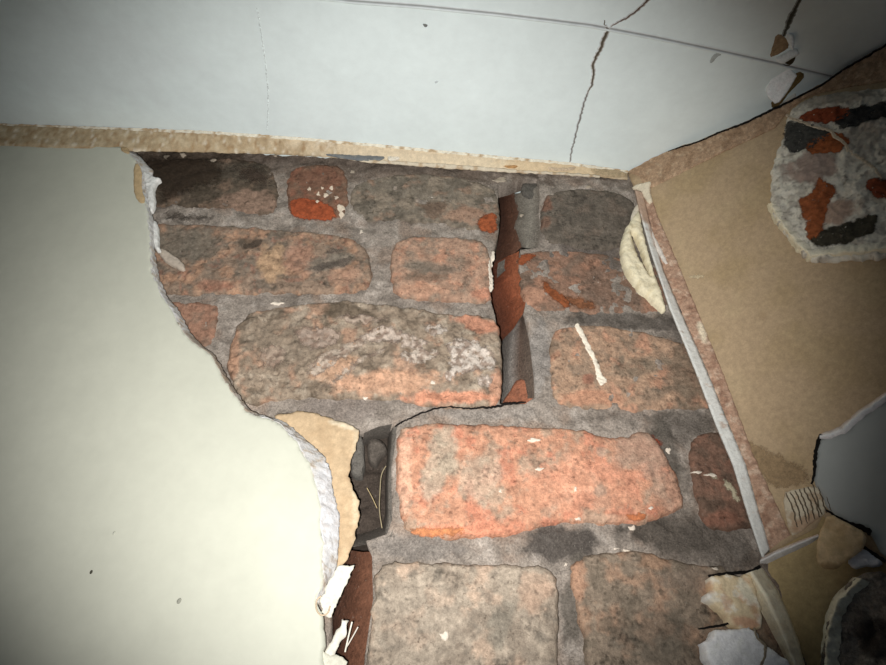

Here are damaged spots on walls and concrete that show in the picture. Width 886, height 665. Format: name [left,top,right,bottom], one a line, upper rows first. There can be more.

crack [569,0,650,162]
peeling [776,33,799,64]
spalling [0,46,886,569]
crack [333,183,540,665]
spalling [743,568,805,665]
spalling [820,571,886,665]